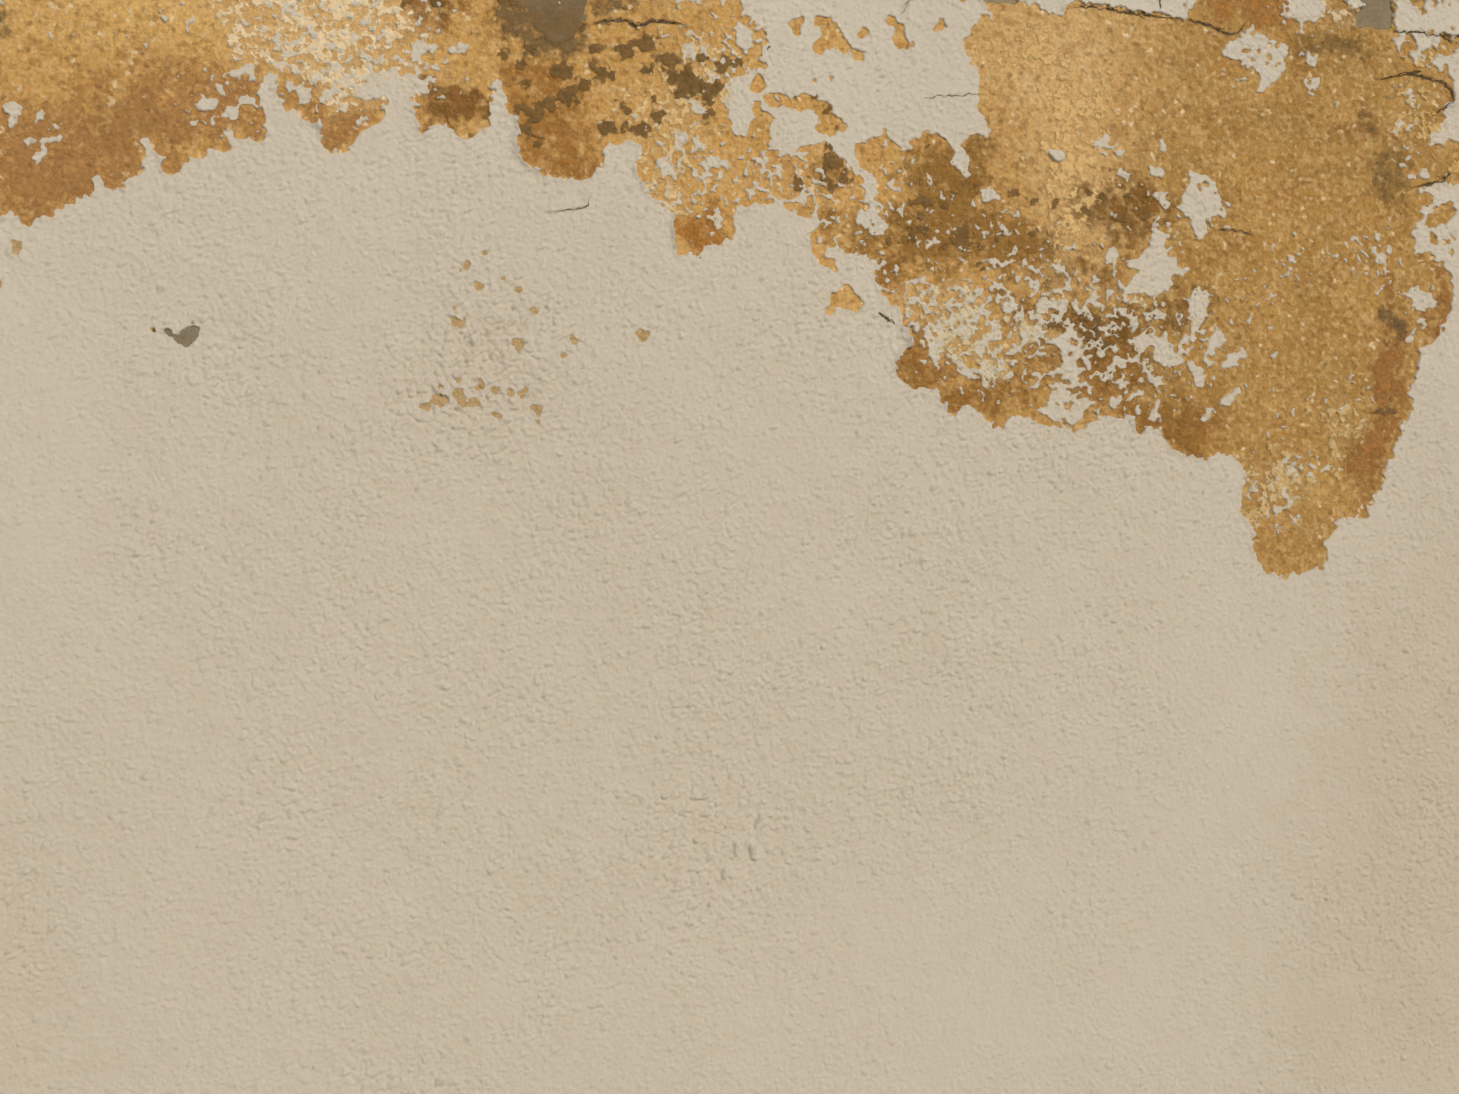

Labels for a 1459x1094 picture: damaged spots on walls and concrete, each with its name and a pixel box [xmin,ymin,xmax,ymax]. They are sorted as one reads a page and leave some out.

crack [596,17,684,30]
crack [1071,0,1247,36]
crack [1393,30,1459,42]
crack [1381,71,1455,116]
crack [1411,172,1452,190]
peeling [0,0,1459,580]